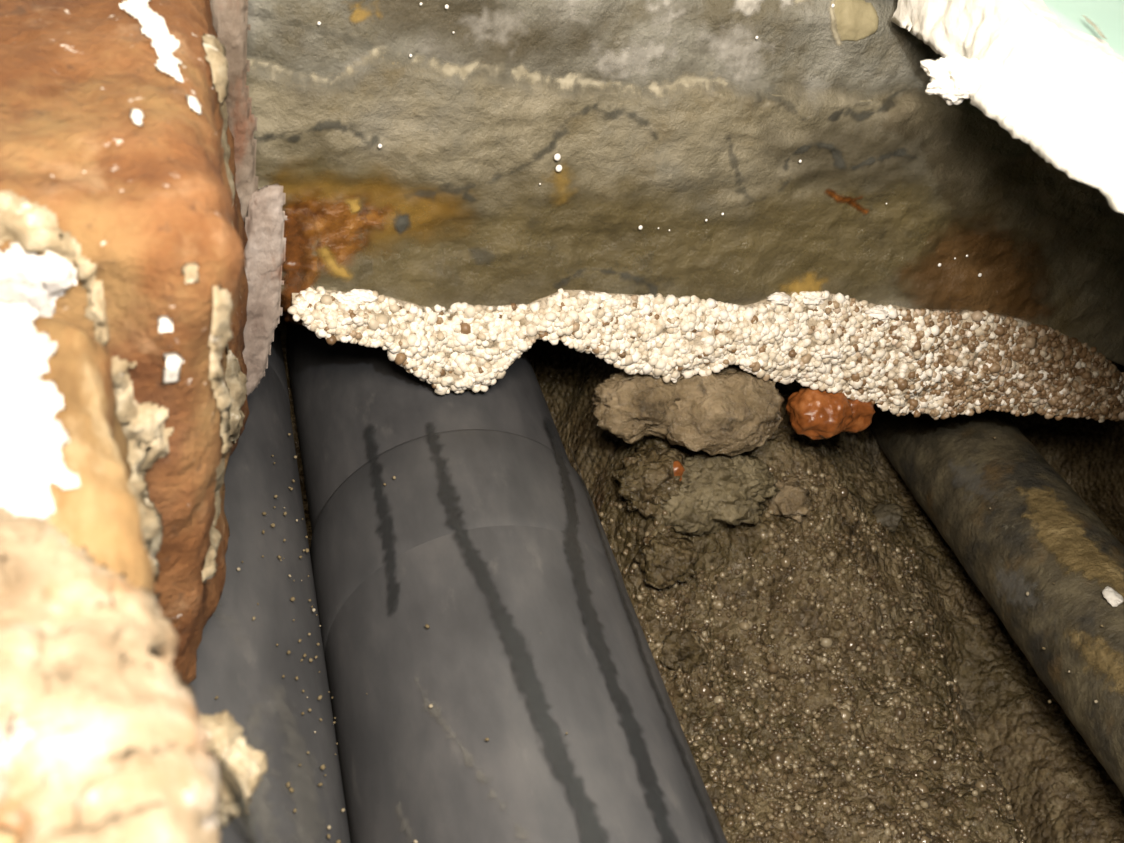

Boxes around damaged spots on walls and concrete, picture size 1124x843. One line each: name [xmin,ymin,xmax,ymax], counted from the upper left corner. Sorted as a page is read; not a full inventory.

crack [254,121,378,144]
crack [537,133,563,158]
crack [583,107,655,135]
spalling [247,0,1124,213]
crack [785,92,913,170]
corrosion [279,181,456,324]
spalling [242,183,1124,423]